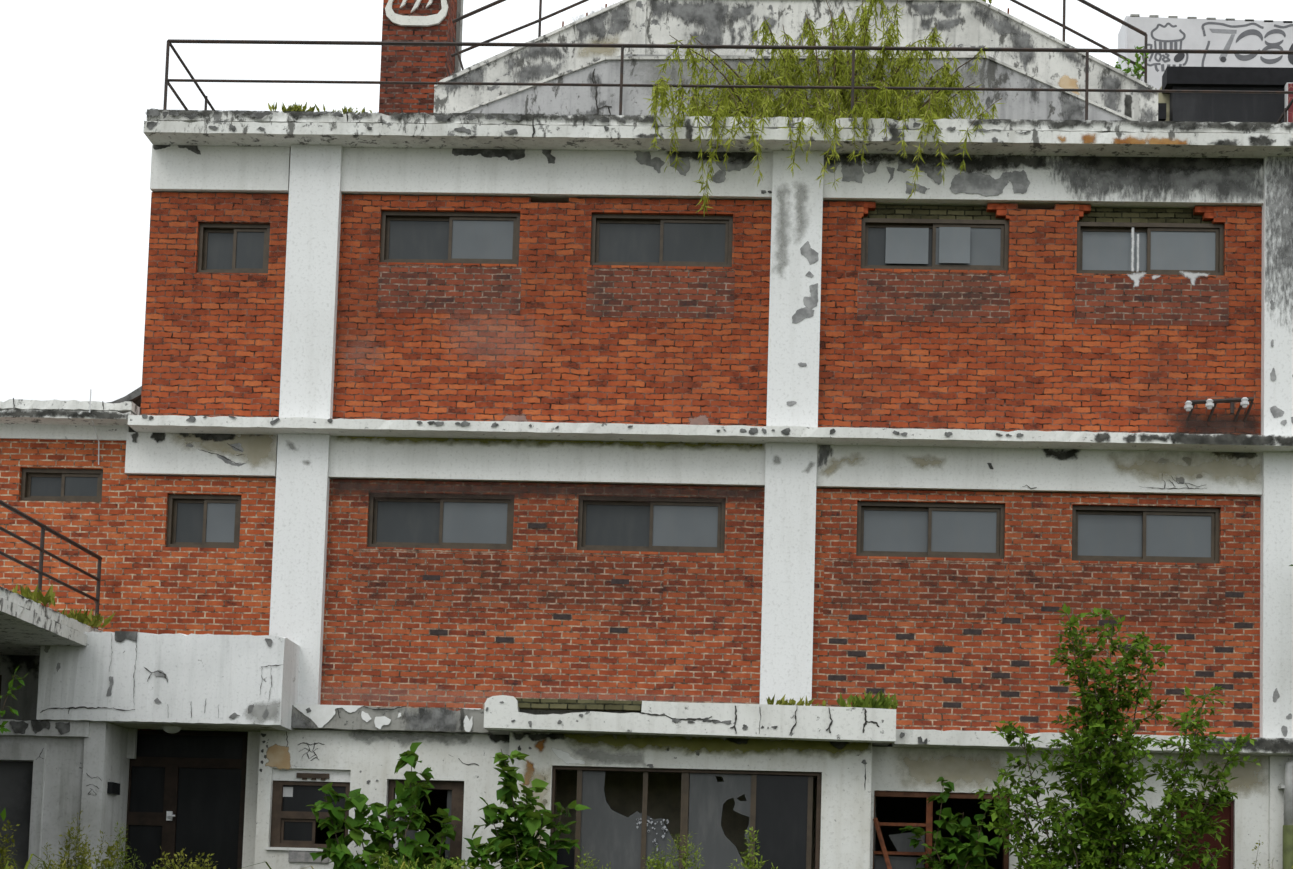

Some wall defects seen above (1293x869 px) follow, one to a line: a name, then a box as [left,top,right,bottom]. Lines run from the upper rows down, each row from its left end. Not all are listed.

damp [445,68,484,94]
damp [506,47,564,83]
damp [574,7,632,54]
damp [651,0,778,91]
damp [911,1,1038,101]
peeling [146,108,272,132]
peeling [435,114,525,161]
peeling [542,150,555,164]
damp [824,75,1293,311]
peeling [792,241,818,323]
peeling [294,704,401,729]
crack [640,706,879,735]